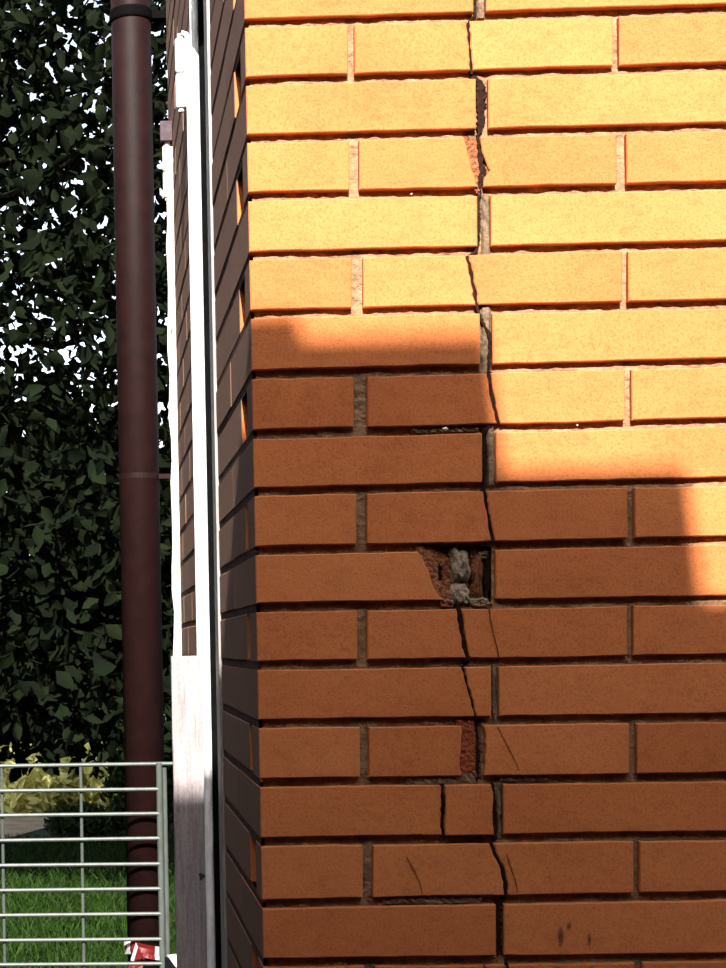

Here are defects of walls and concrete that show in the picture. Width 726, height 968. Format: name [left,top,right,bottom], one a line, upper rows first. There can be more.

crack [465,0,500,543]
spalling [415,547,492,607]
spalling [456,719,487,783]
crack [453,602,520,770]
crack [483,782,518,968]